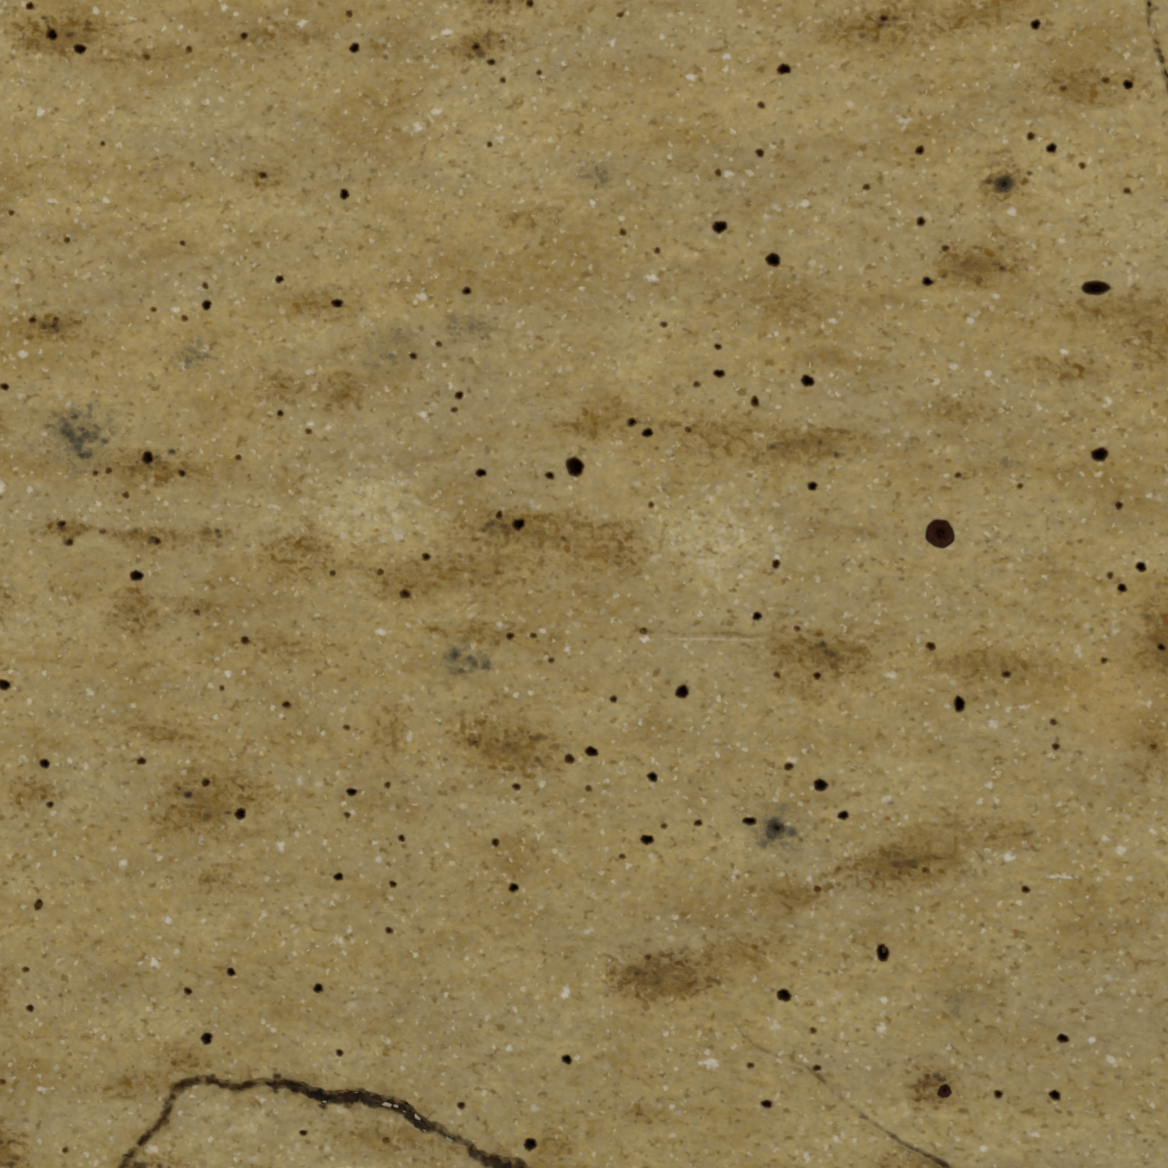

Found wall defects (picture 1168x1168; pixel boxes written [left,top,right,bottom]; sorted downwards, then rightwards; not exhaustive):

crack [1147,1,1168,78]
crack [121,1074,524,1168]
crack [891,1136,949,1168]